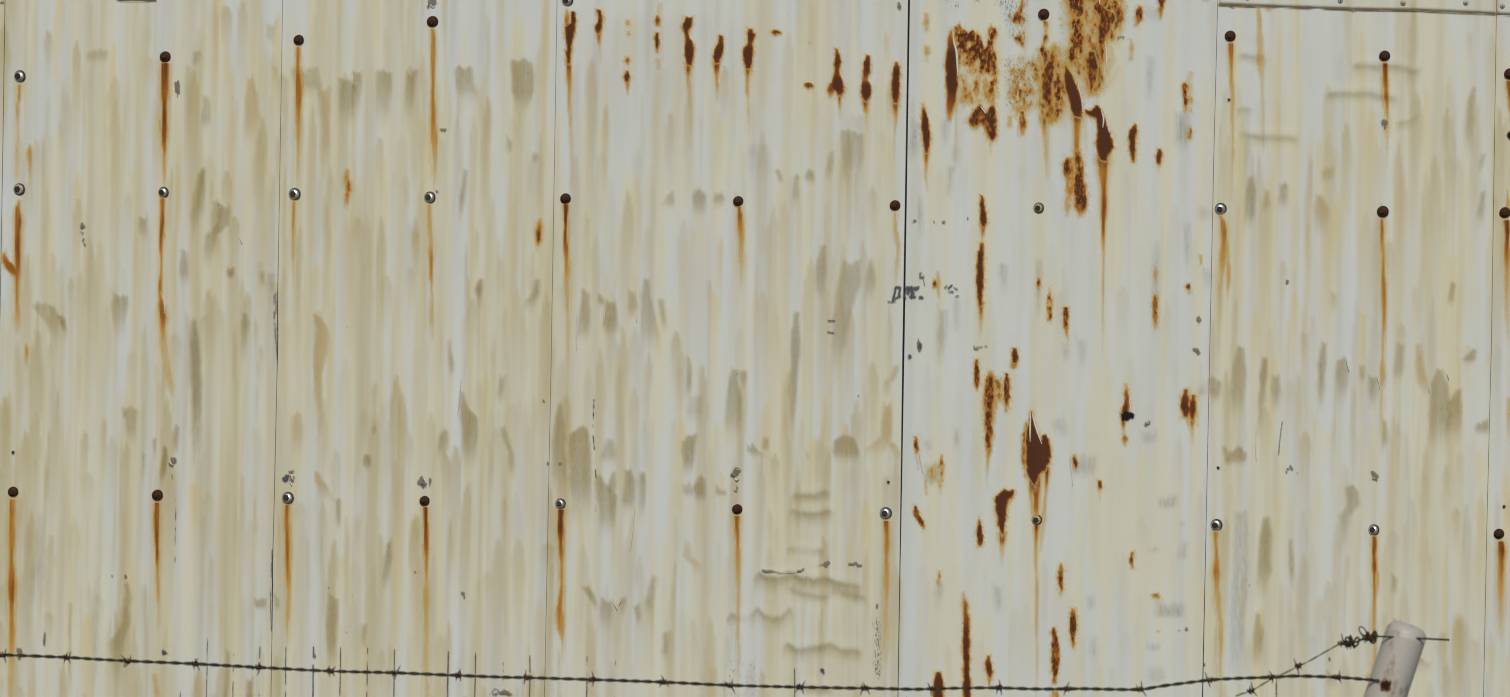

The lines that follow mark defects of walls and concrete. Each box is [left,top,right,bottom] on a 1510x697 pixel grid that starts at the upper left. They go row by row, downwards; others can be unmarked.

corrosion [681,16,724,89]
corrosion [742,28,782,94]
corrosion [804,47,872,113]
corrosion [890,61,901,123]
corrosion [921,103,931,173]
corrosion [925,0,1166,292]
corrosion [2,200,22,321]
corrosion [975,194,987,320]
corrosion [973,347,1019,465]
corrosion [1180,388,1197,429]
corrosion [976,410,1077,697]
corrosion [932,593,994,697]